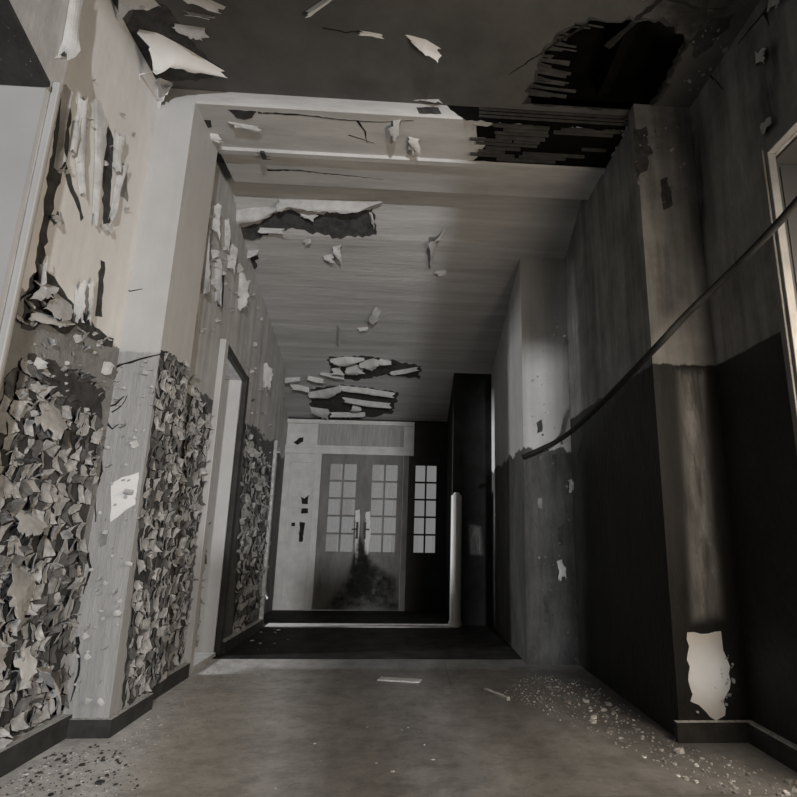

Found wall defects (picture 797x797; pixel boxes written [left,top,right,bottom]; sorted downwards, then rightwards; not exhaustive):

peeling [0,84,214,748]